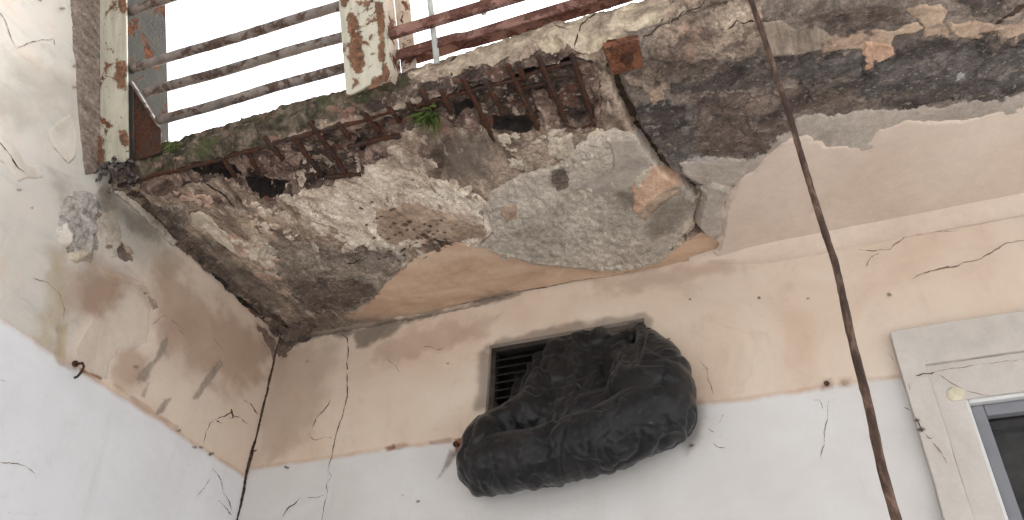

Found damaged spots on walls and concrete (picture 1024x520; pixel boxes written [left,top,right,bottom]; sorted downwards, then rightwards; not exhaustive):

crack [641,1,705,38]
peeling [622,0,763,105]
peeling [817,4,1024,72]
peeling [60,0,719,381]
water stain [117,242,133,261]
water stain [123,201,516,360]
crack [855,231,953,267]
crack [912,240,1024,279]
water stain [141,339,167,396]
water stain [194,361,221,398]
crack [197,337,281,520]
crack [283,335,349,518]